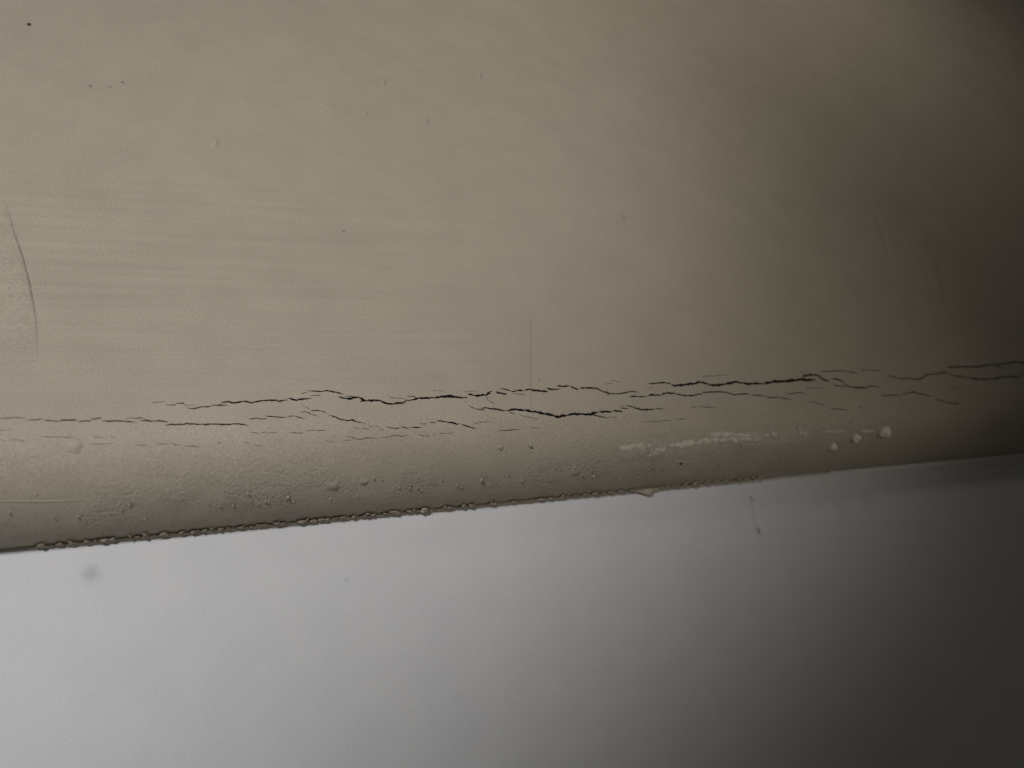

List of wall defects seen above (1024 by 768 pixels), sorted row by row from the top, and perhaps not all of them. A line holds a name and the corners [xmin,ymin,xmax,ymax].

crack [0,361,1024,458]